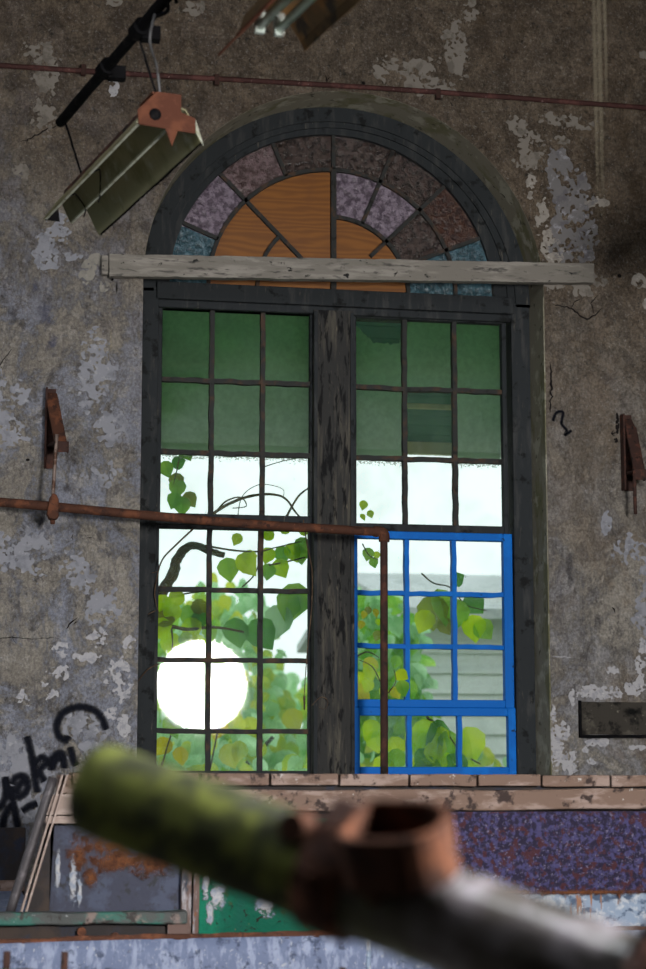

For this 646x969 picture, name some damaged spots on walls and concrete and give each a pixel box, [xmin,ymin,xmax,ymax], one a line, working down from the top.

peeling [362,0,479,103]
peeling [506,111,610,263]
peeling [31,213,109,293]
crack [553,295,601,320]
peeling [544,272,646,309]
peeling [0,369,33,455]
peeling [76,326,129,448]
peeling [0,514,136,755]
peeling [568,510,646,706]
peeling [0,732,69,824]
peeling [550,695,609,775]
rust [67,832,170,886]